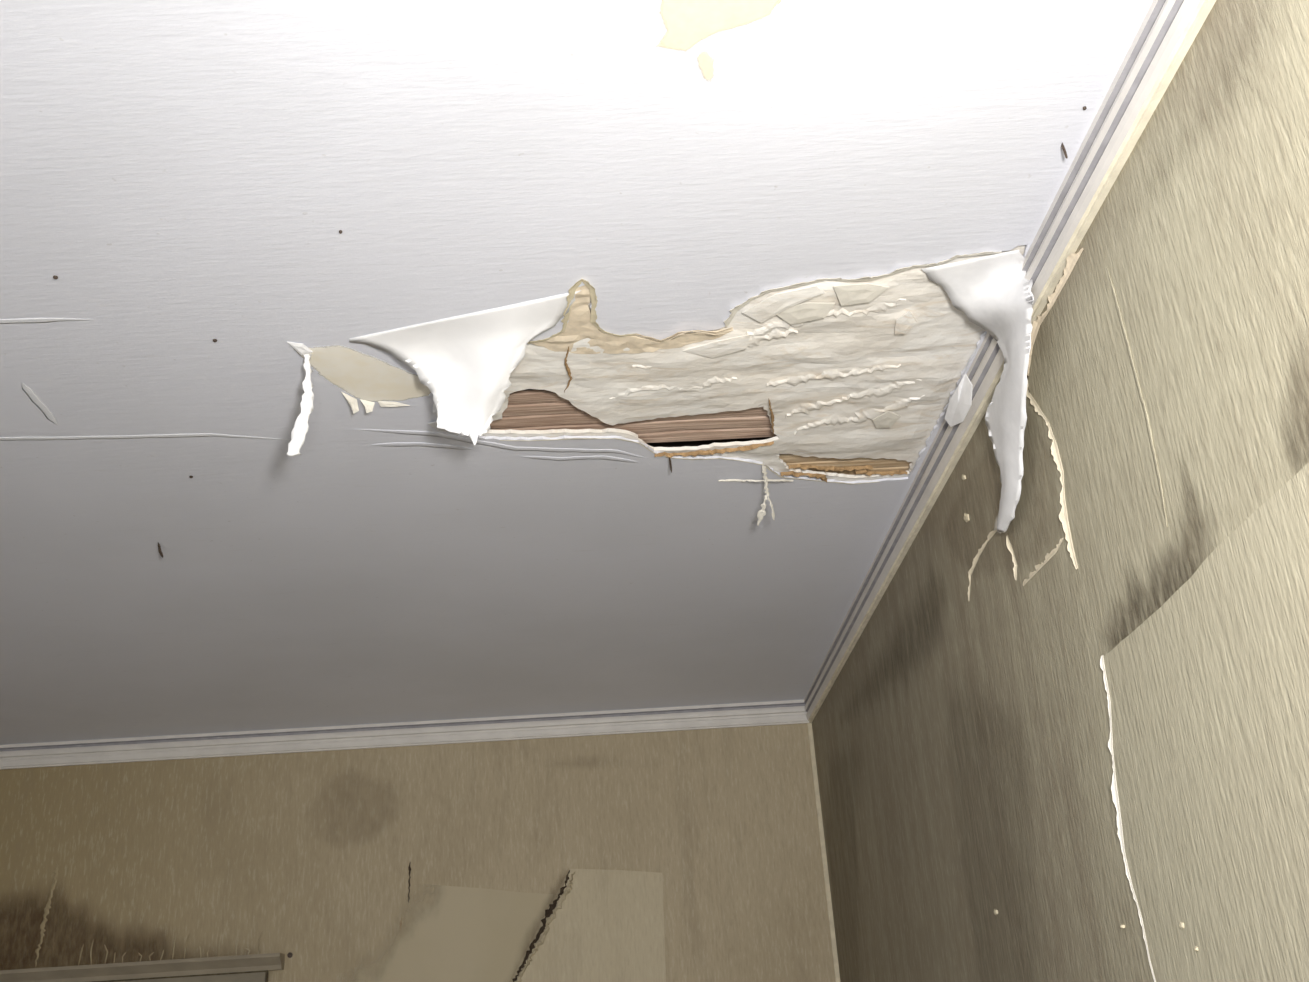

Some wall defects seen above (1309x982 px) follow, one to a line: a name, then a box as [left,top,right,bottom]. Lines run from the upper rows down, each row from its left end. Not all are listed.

spalling [286,245,1034,534]
leakage [0,902,263,970]